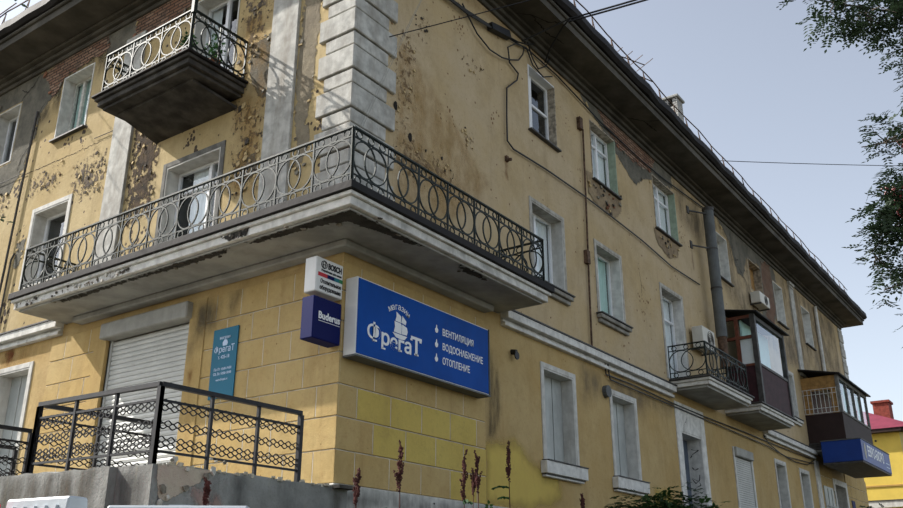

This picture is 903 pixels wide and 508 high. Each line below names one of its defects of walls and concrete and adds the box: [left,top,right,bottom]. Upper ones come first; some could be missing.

flaking render [0,0,192,227]
flaking render [227,0,272,198]
peeling [393,14,452,188]
spalling [654,228,680,258]
flaking render [157,456,254,506]